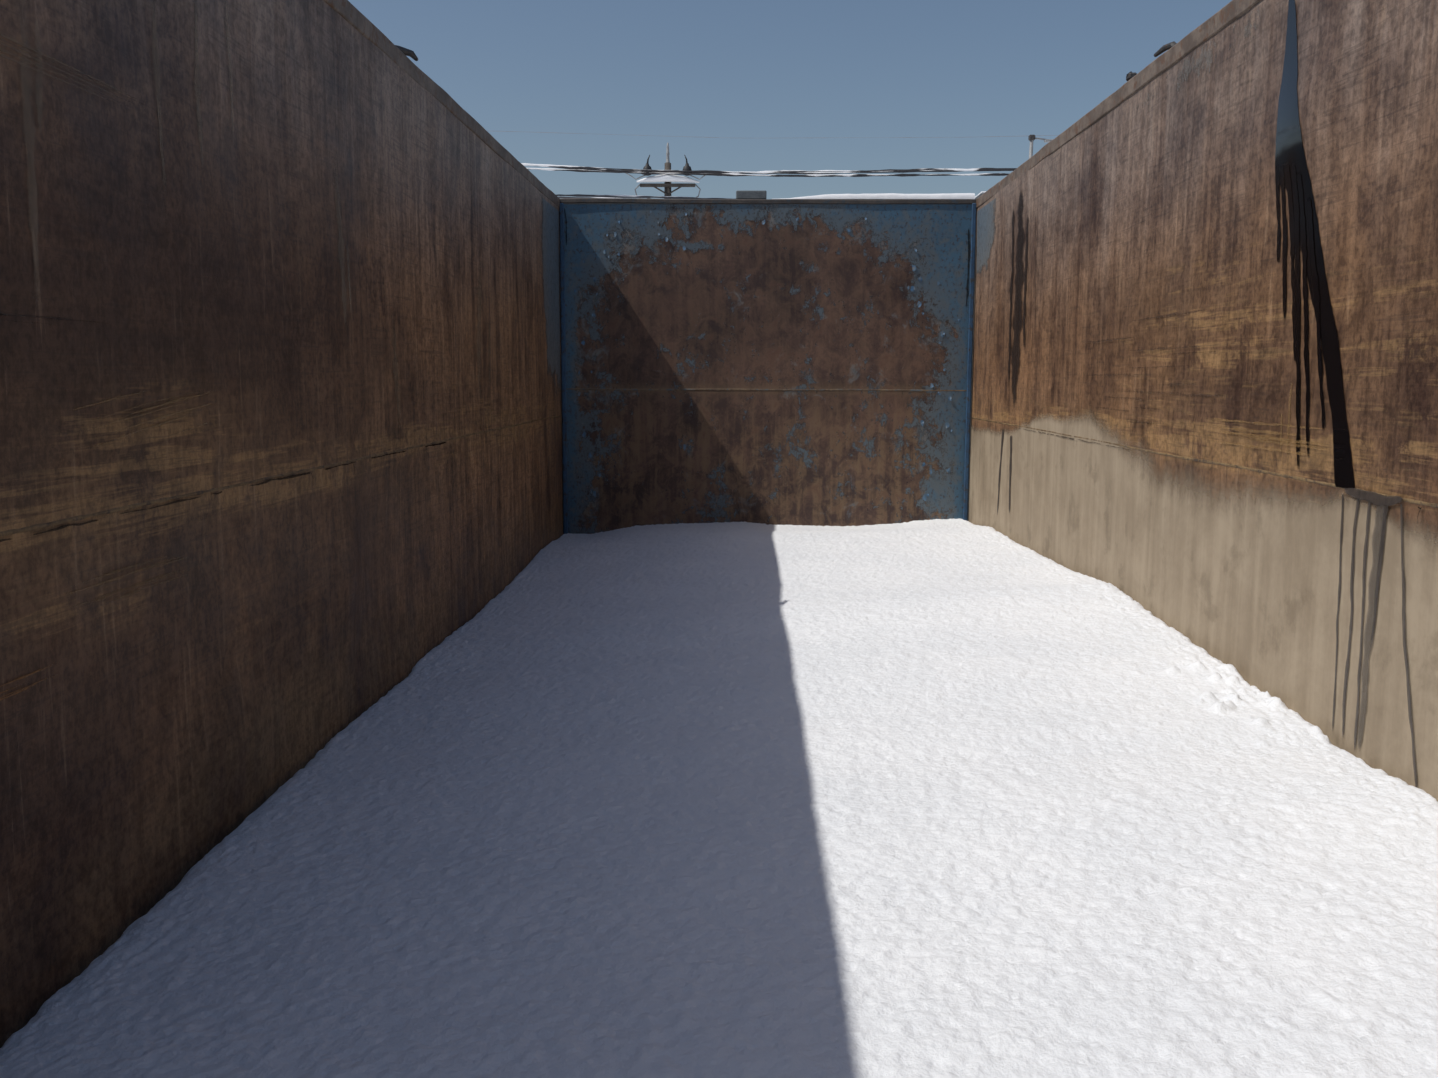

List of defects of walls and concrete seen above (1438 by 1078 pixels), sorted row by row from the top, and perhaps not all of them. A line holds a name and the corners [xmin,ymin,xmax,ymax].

damp [1008,193,1028,402]
damp [1275,0,1417,787]